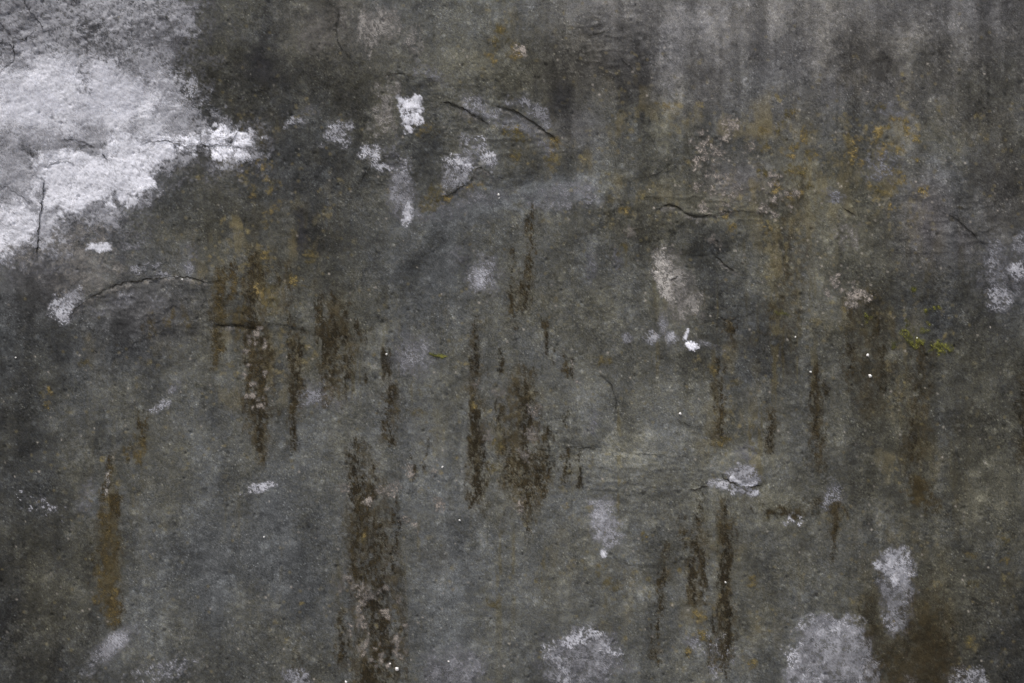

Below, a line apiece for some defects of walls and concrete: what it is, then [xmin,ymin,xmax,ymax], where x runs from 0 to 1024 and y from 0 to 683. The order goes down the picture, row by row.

crack [382,71,555,139]
crack [647,161,753,232]
damp [239,252,372,462]
damp [465,316,623,558]
damp [335,437,407,683]
damp [536,625,631,683]
damp [649,493,737,678]
damp [784,545,987,683]